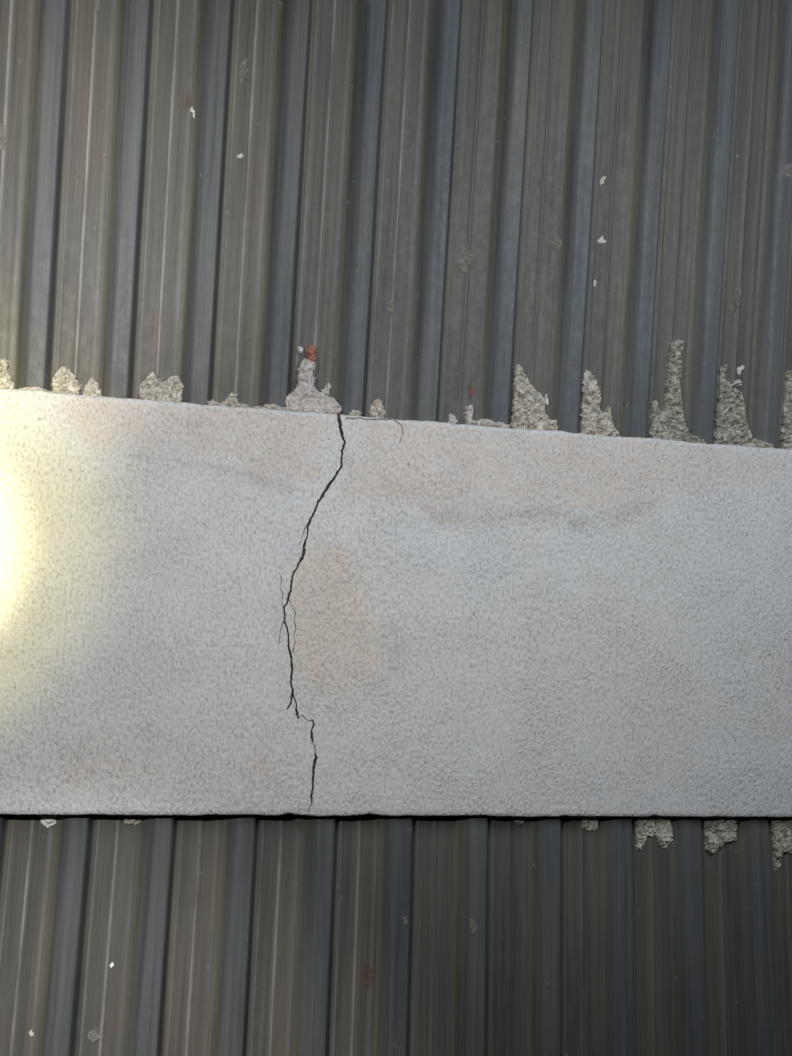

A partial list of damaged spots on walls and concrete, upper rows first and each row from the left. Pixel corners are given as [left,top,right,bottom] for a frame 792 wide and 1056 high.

crack [278,413,404,813]